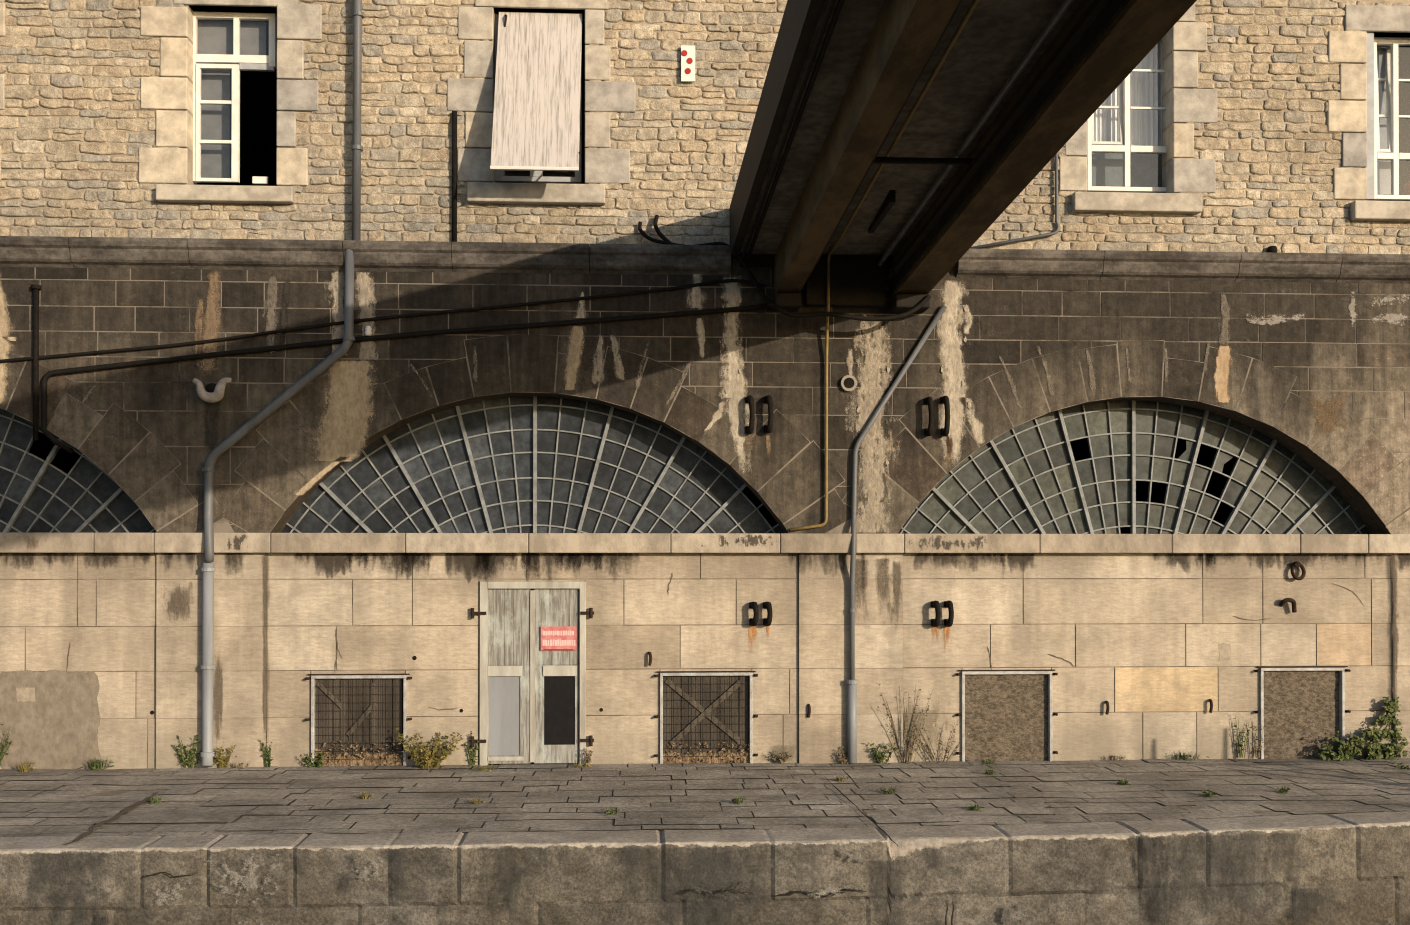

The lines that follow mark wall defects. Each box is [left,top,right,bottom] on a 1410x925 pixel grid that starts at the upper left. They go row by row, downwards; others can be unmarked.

water stain [0,285,16,404]
water stain [565,292,649,390]
water stain [667,274,706,404]
water stain [705,278,751,467]
water stain [937,281,984,462]
water stain [999,356,1020,407]
water stain [1086,350,1096,390]
water stain [1204,294,1230,403]
water stain [1247,314,1304,325]
water stain [296,553,638,581]
water stain [701,535,773,547]
water stain [790,536,1034,613]